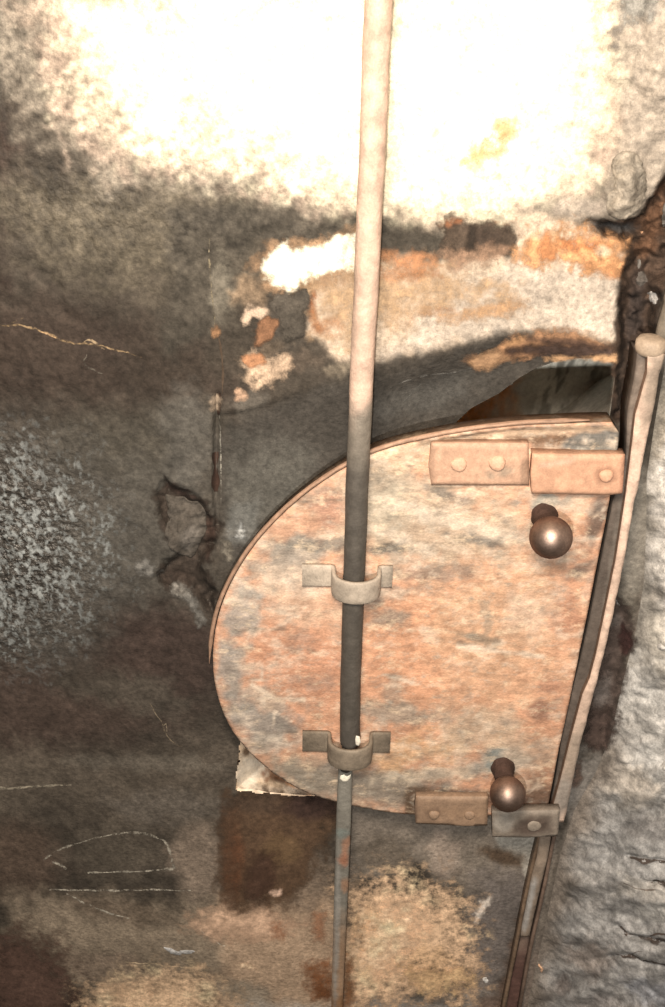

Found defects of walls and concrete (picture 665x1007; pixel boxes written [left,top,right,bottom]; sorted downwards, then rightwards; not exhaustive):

flaking render [234,229,356,401]
spalling [593,178,665,419]
flaking render [209,394,221,410]
leakage [0,443,110,653]
crack [616,926,665,965]
crack [624,857,665,891]